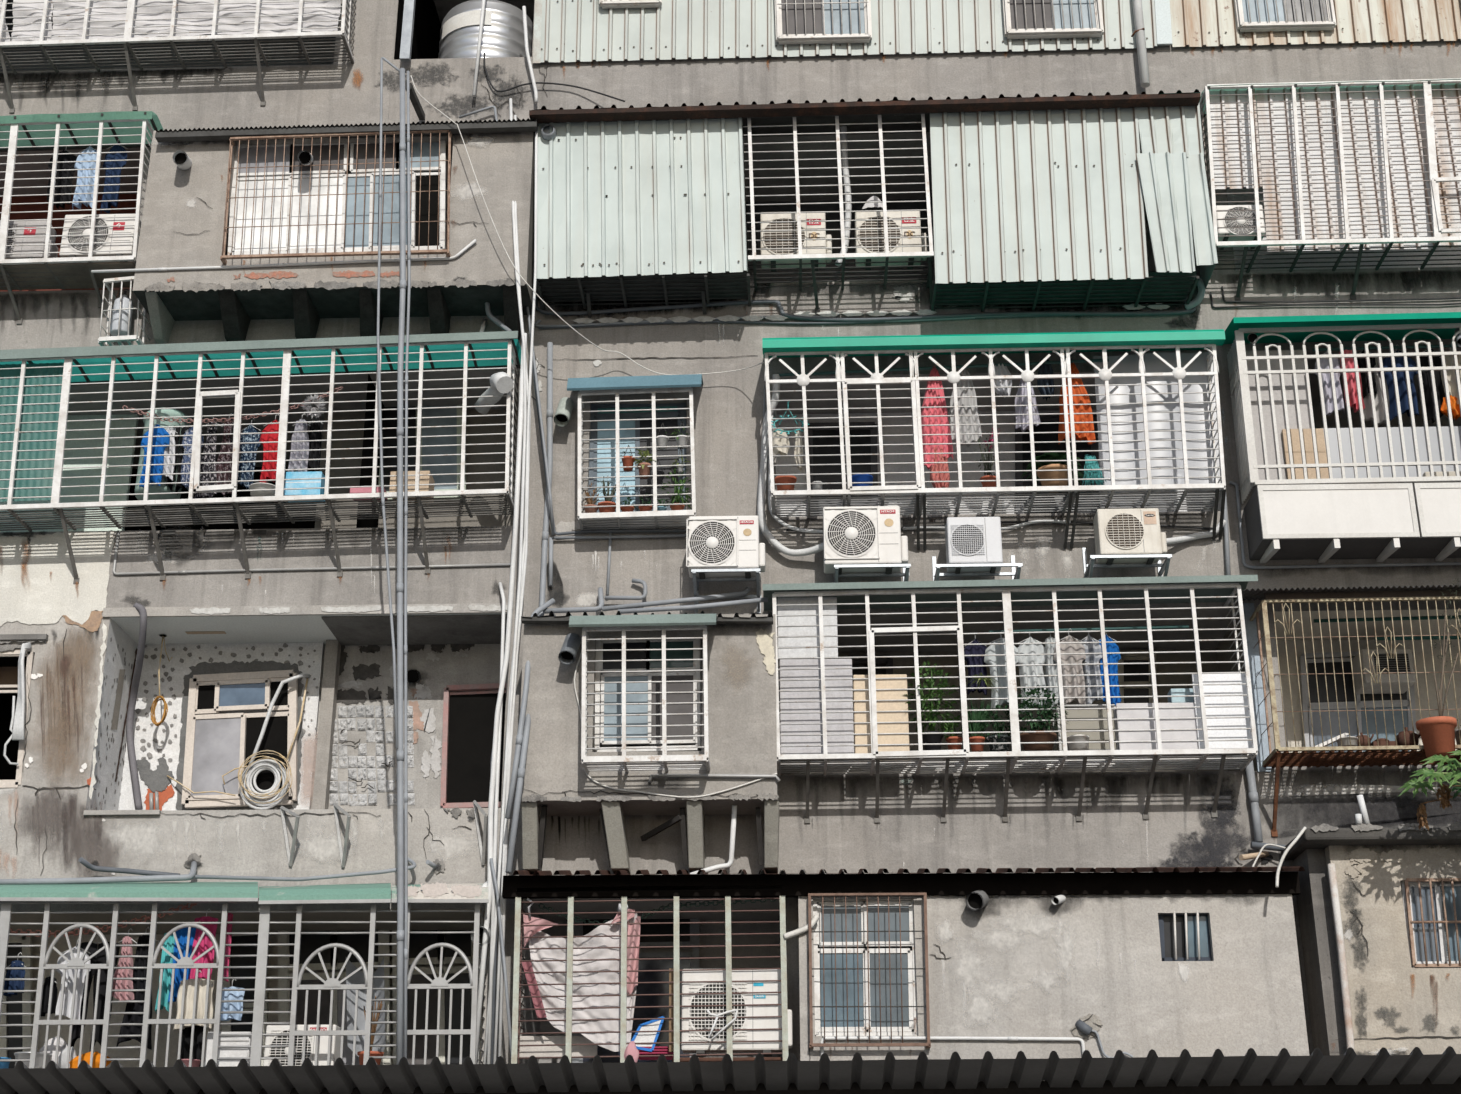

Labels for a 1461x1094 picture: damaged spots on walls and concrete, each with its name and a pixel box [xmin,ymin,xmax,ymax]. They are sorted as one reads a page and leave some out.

peeling [321,605,382,613]
peeling [407,604,508,612]
leakage [41,628,99,774]
peeling [0,530,319,821]
peeling [337,644,475,778]
leakage [24,796,196,873]
leakage [429,834,476,857]
spalling [444,807,475,820]
leakage [805,773,1250,867]
leakage [1262,768,1461,852]
leakage [1344,878,1367,964]
leakage [1356,994,1457,1055]